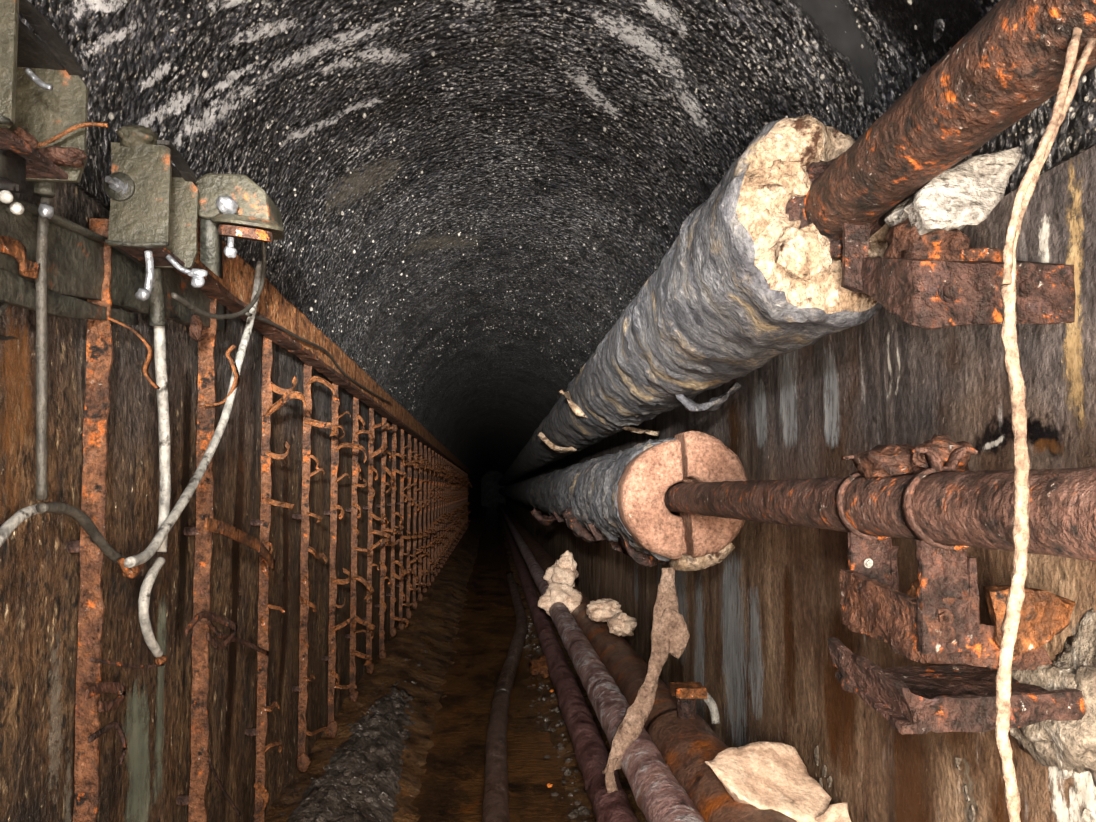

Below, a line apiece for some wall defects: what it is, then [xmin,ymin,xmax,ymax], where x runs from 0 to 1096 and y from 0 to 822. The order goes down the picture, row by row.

corrosion [784,571,795,714]
corrosion [824,615,854,771]
corrosion [992,783,1027,822]